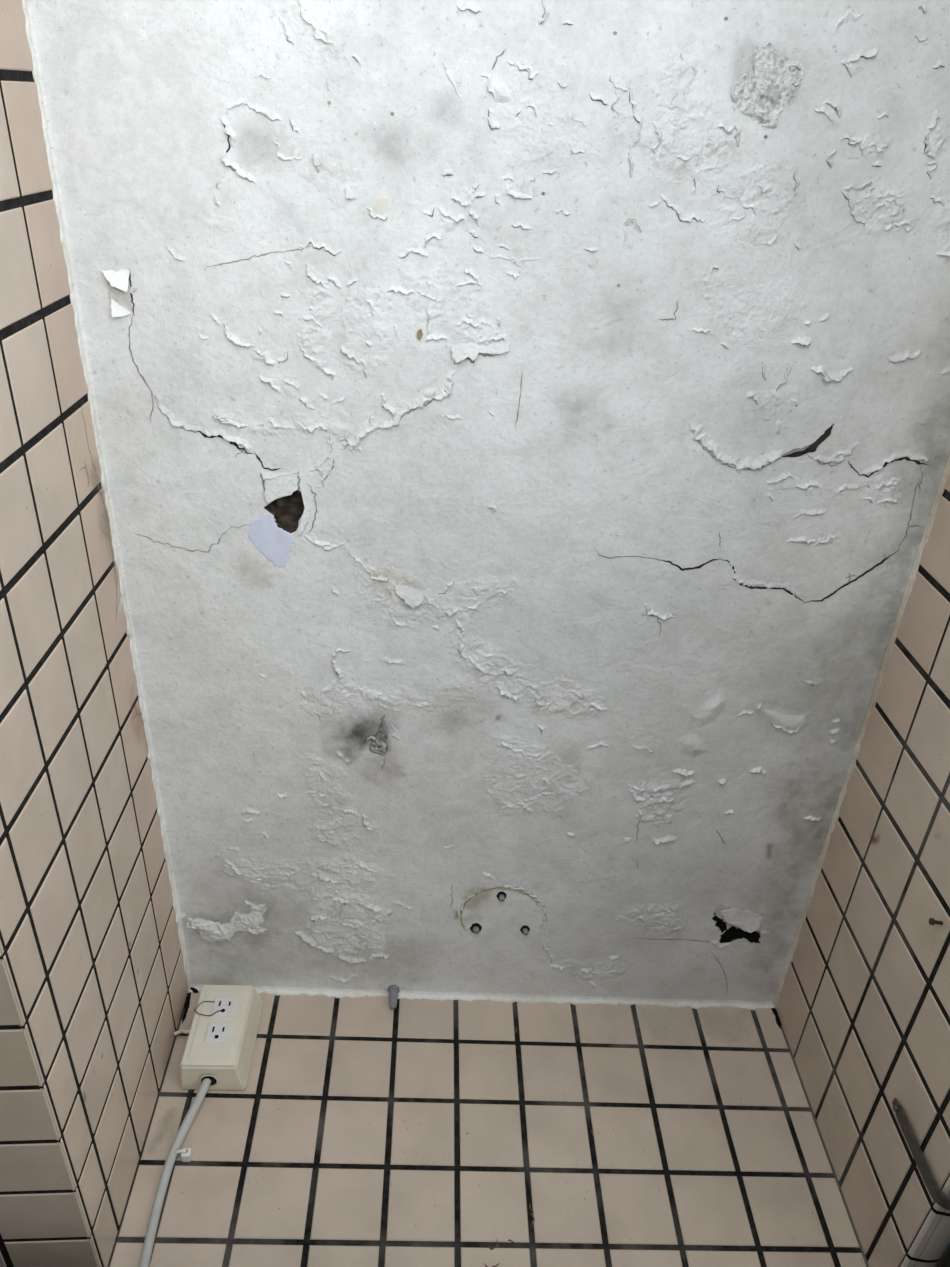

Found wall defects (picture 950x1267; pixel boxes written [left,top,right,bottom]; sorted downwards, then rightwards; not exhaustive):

peeling [215,97,364,209]
peeling [917,110,950,185]
peeling [102,269,137,318]
crack [129,316,281,471]
crack [80,403,249,624]
crack [595,420,932,603]
leakage [354,716,400,770]
spalling [180,900,271,944]
spalling [709,904,770,948]